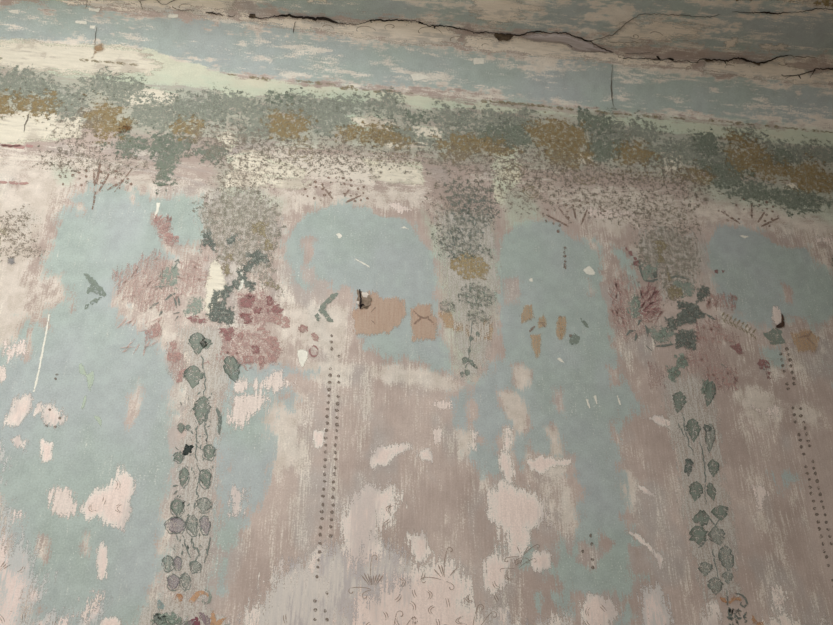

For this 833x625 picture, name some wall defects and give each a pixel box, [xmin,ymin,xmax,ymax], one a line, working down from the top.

peeling [0,37,163,77]
peeling [56,0,833,86]
crack [139,0,833,106]
spalling [356,289,372,309]
spalling [771,306,785,328]
peeling [297,349,308,367]
peeling [226,365,297,430]
peeling [0,392,68,485]
peeling [46,465,136,532]
peeling [227,426,623,625]
peeling [0,496,121,625]
peeling [636,579,675,625]